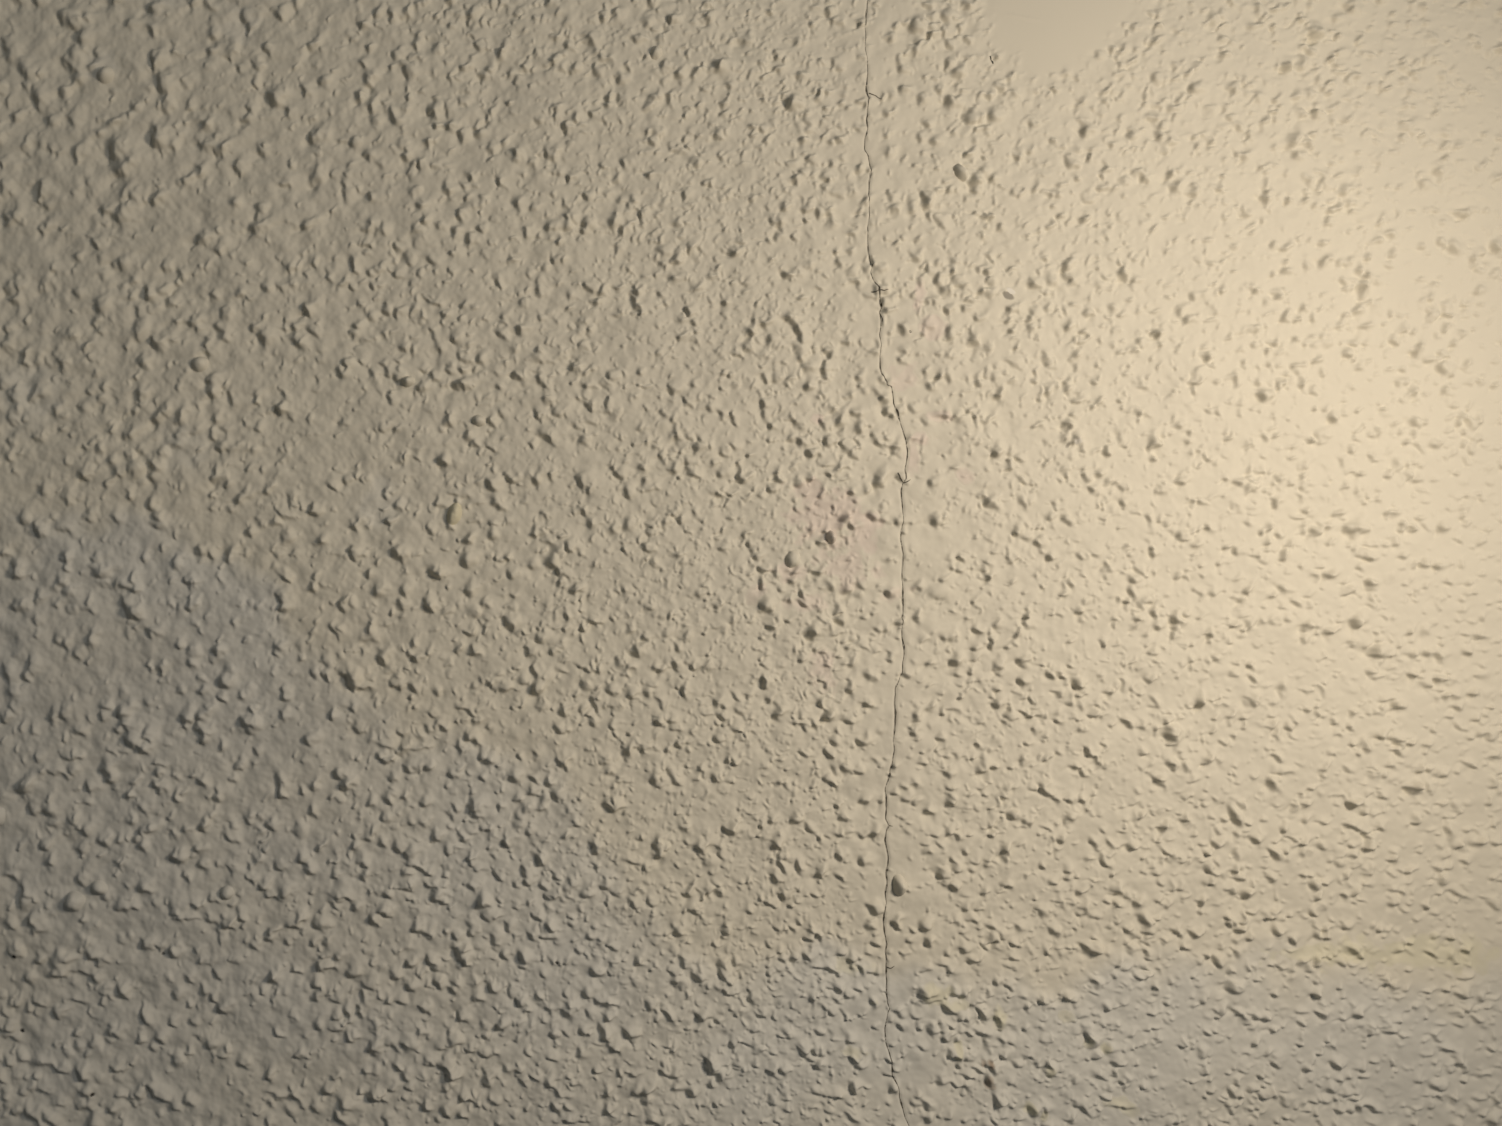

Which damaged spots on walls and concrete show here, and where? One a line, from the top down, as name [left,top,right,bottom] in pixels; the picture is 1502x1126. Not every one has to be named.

crack [864,2,911,1125]